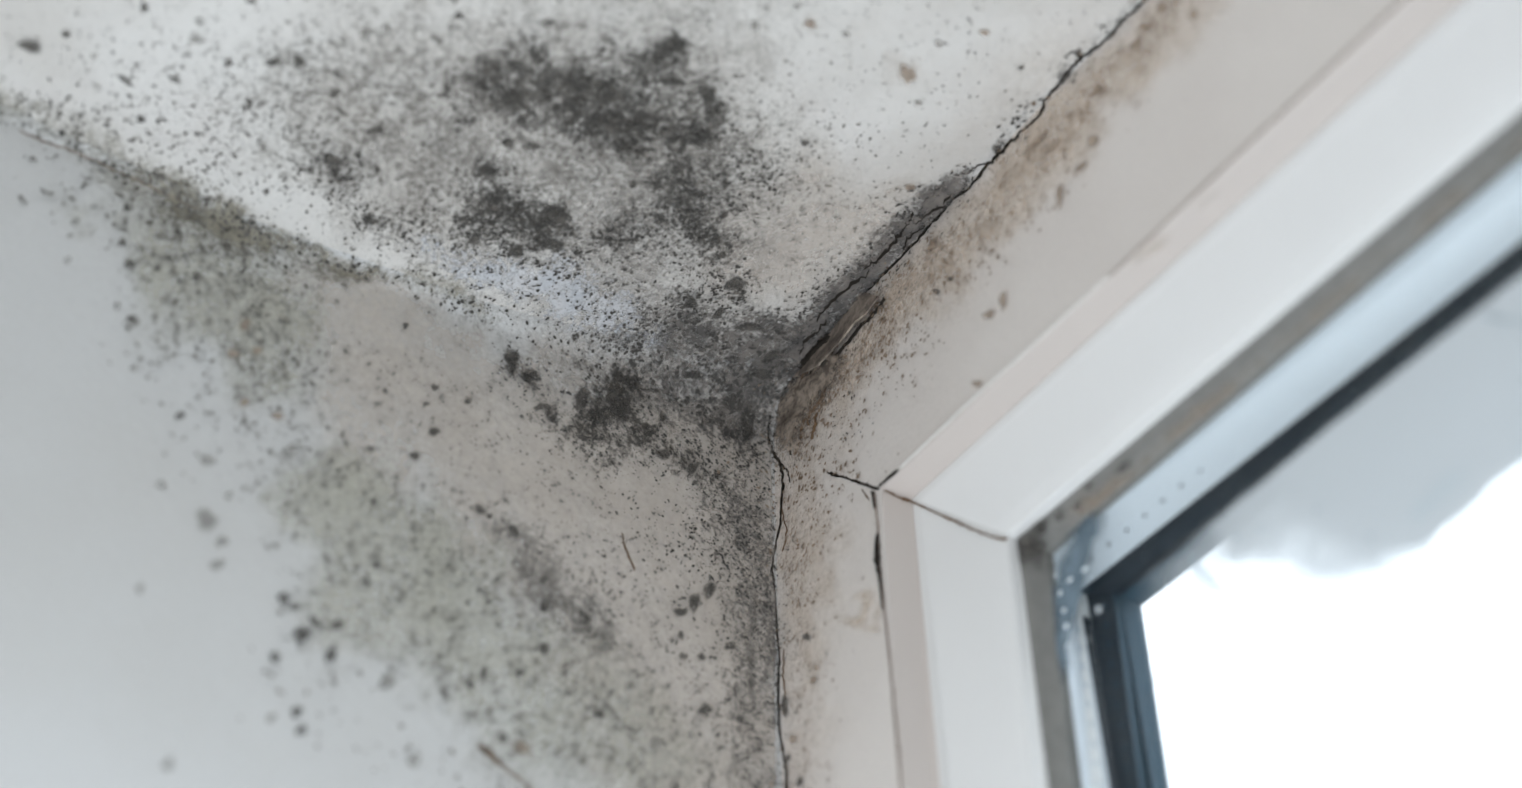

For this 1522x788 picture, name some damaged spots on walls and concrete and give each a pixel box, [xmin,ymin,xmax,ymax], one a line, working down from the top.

leakage [0,0,1197,788]
crack [767,0,1145,788]
crack [827,0,1404,788]